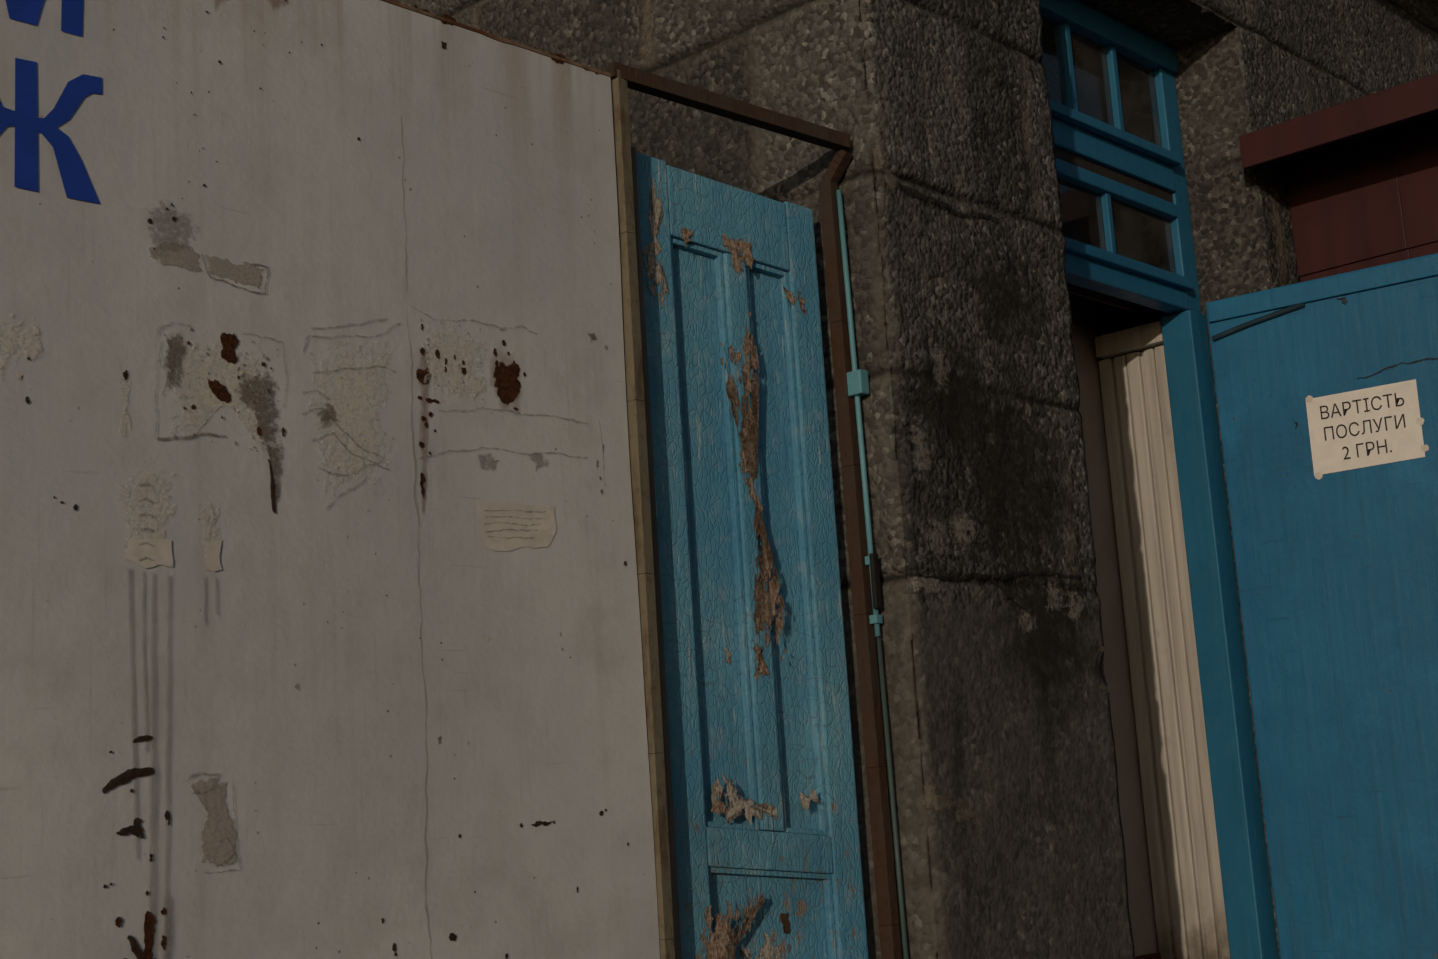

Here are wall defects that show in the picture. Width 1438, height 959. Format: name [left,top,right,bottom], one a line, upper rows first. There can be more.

peeling [642,174,669,308]
rust [493,340,526,411]
peeling [720,312,788,680]
water stain [908,337,1086,691]
rust [116,818,144,839]
peeling [711,773,778,825]
rust [115,891,166,959]
peeling [695,892,791,959]